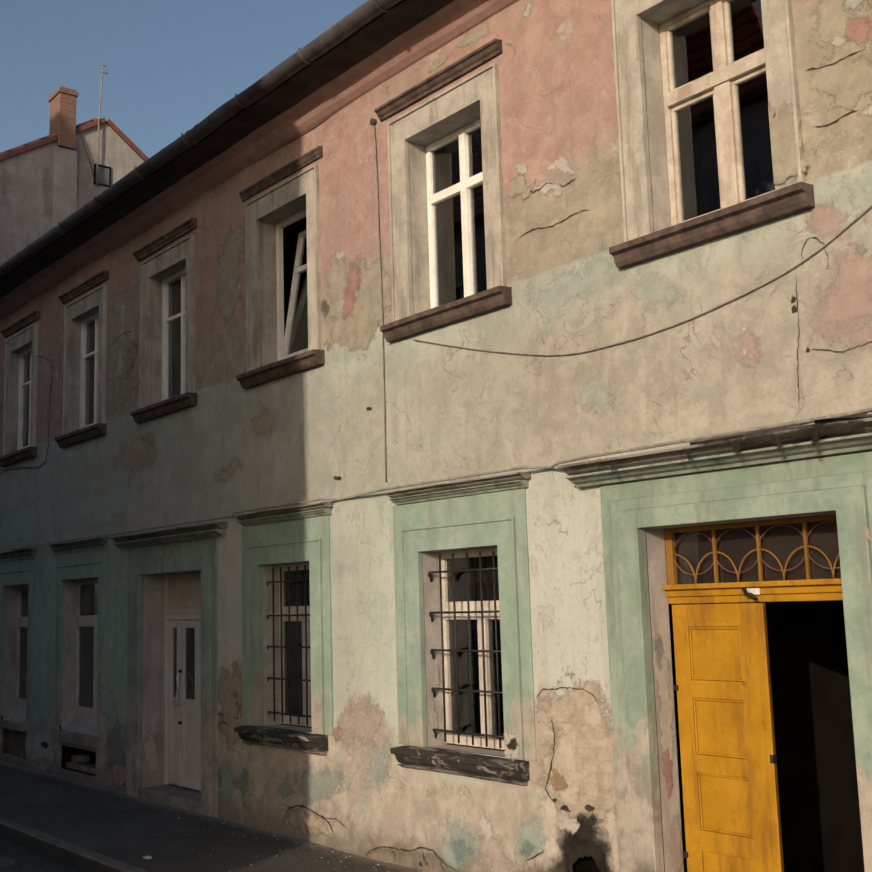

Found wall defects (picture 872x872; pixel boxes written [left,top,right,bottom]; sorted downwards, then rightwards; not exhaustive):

peeling [805,0,872,127]
peeling [546,156,574,175]
peeling [768,100,809,185]
crack [521,209,590,236]
crack [795,237,872,414]
peeling [218,661,244,751]
peeling [334,694,384,754]
spalling [534,667,617,835]
crack [283,804,347,837]
damp [569,813,596,843]
crack [365,846,458,871]